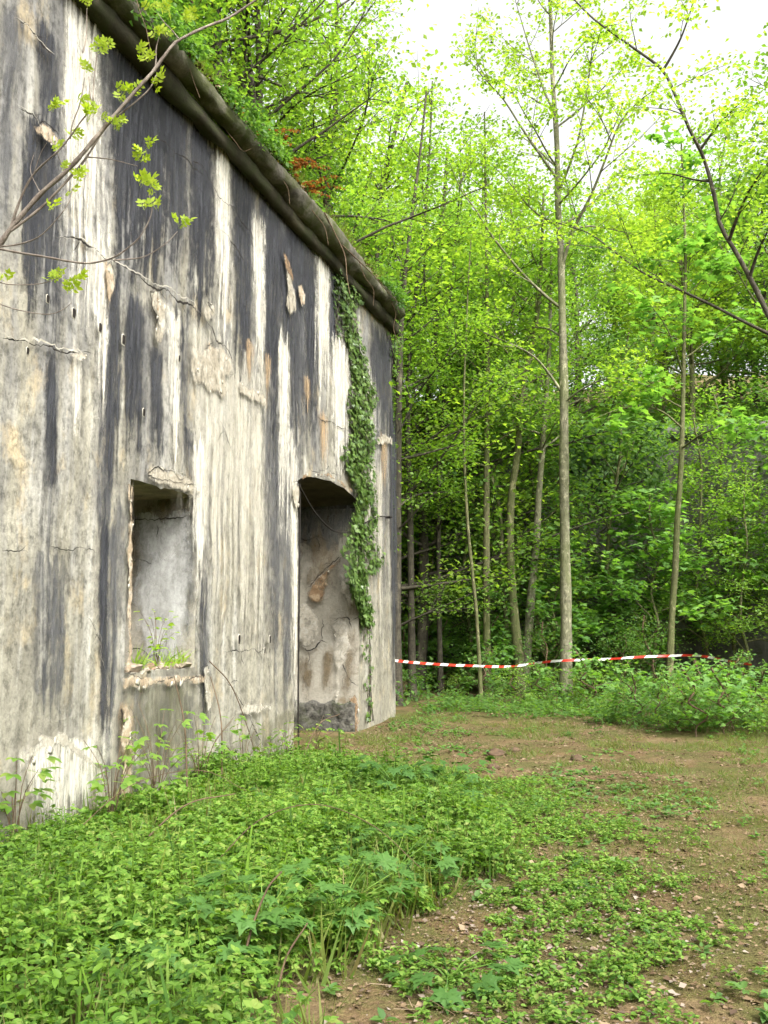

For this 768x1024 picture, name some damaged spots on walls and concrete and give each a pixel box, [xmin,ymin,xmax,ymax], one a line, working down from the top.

spalling [36,121,59,145]
crack [55,236,234,377]
spalling [283,252,305,314]
crack [0,336,86,362]
damp [1,0,351,769]
peeling [178,347,266,405]
spalling [148,466,201,493]
damp [363,325,398,687]
spalling [123,480,212,710]
peeling [297,559,354,646]
crack [297,616,358,662]